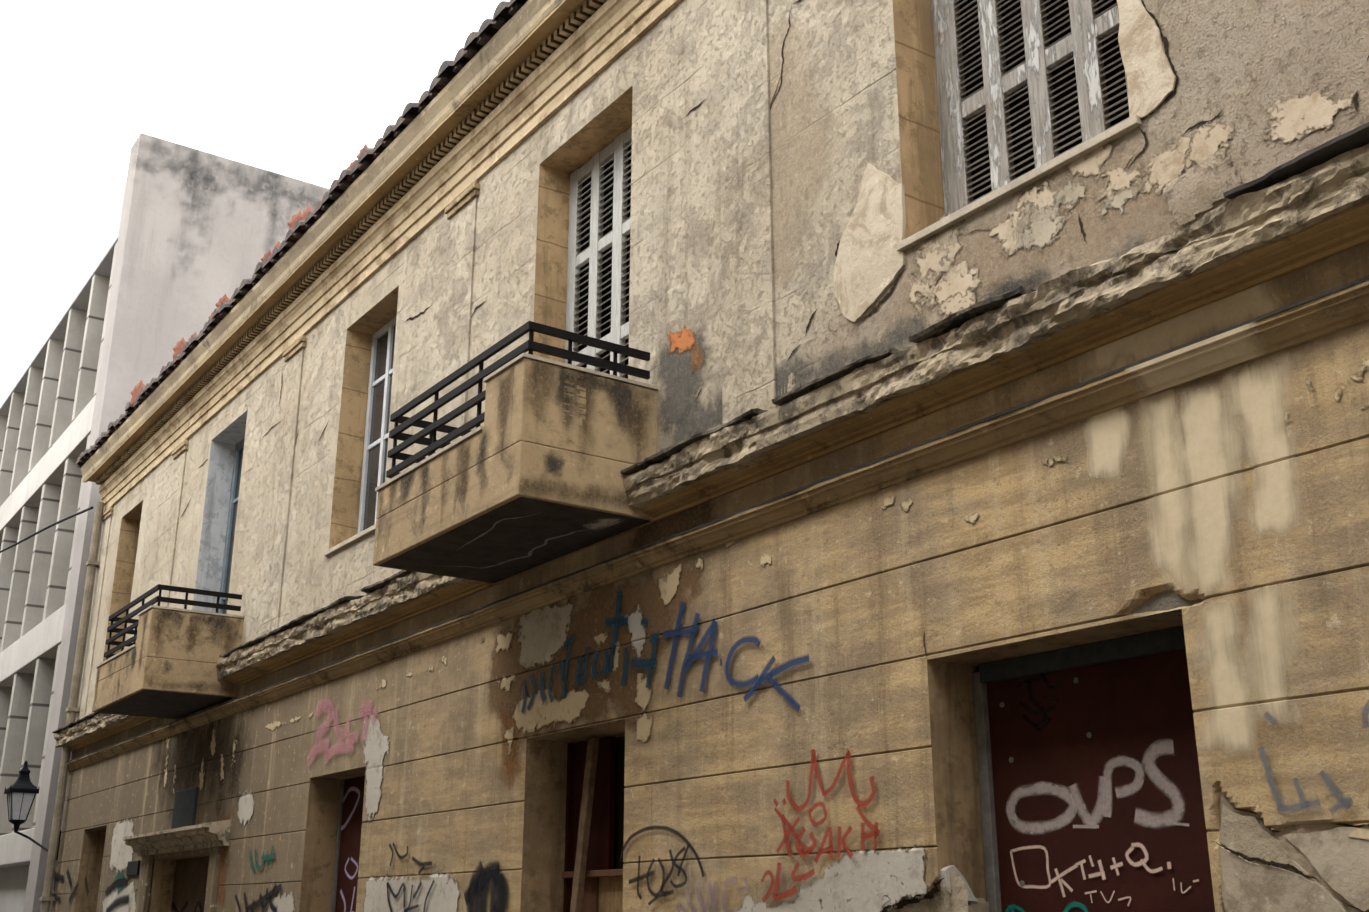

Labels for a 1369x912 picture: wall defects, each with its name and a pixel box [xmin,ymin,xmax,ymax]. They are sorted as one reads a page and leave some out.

crack [770,0,801,109]
peeling [1117,0,1176,119]
peeling [1261,70,1356,150]
peeling [834,115,1241,323]
water stain [459,369,513,499]
water stain [531,363,643,445]
water stain [659,335,723,444]
water stain [775,318,925,398]
crack [452,526,607,568]
water stain [1082,282,1297,751]
peeling [480,558,703,763]
spalling [1213,791,1369,912]